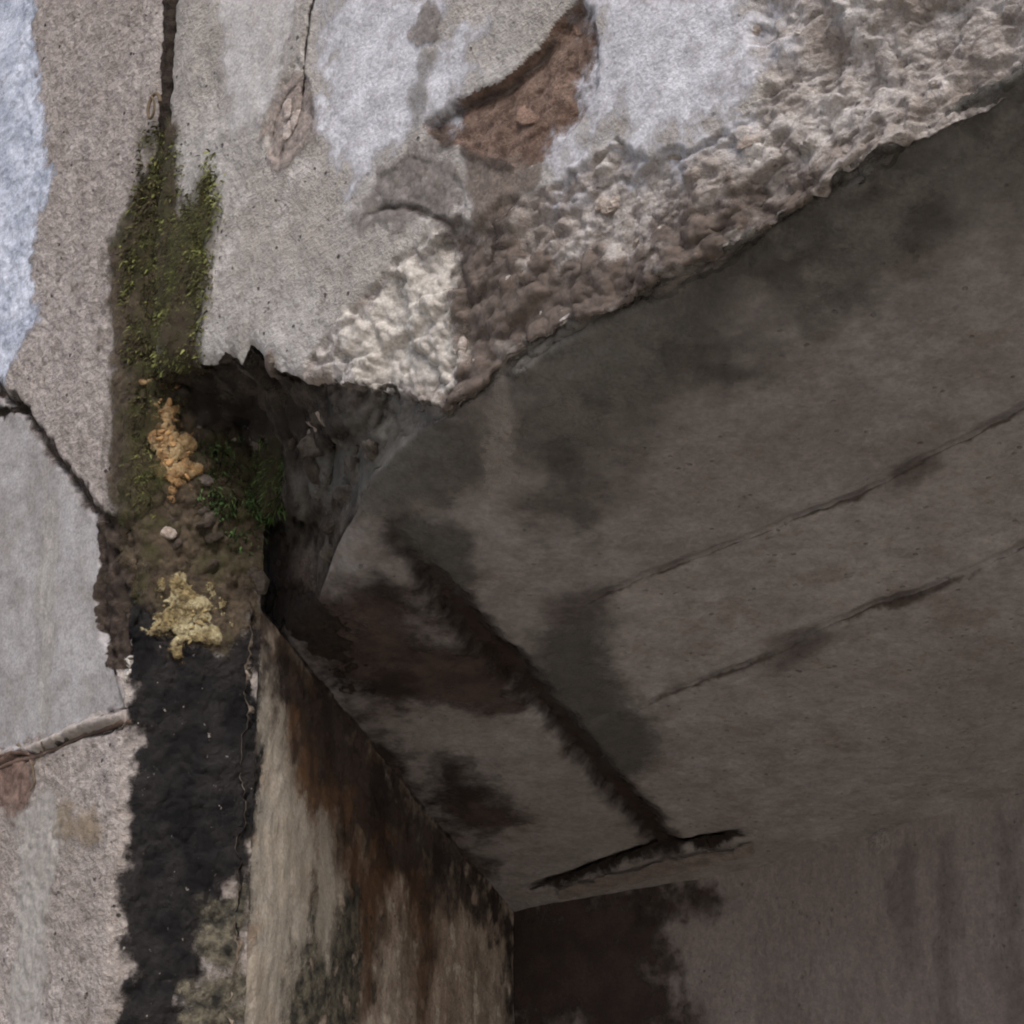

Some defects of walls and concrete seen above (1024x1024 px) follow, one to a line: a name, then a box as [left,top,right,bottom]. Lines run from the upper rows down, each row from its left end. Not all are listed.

crack [152,0,179,257]
spalling [172,0,1024,632]
crack [0,380,111,522]
spalling [160,516,183,550]
crack [828,573,974,626]
crack [793,408,1024,520]
crack [18,708,129,759]
crack [386,520,798,899]
leakage [115,600,384,1024]
leakage [472,876,722,1024]